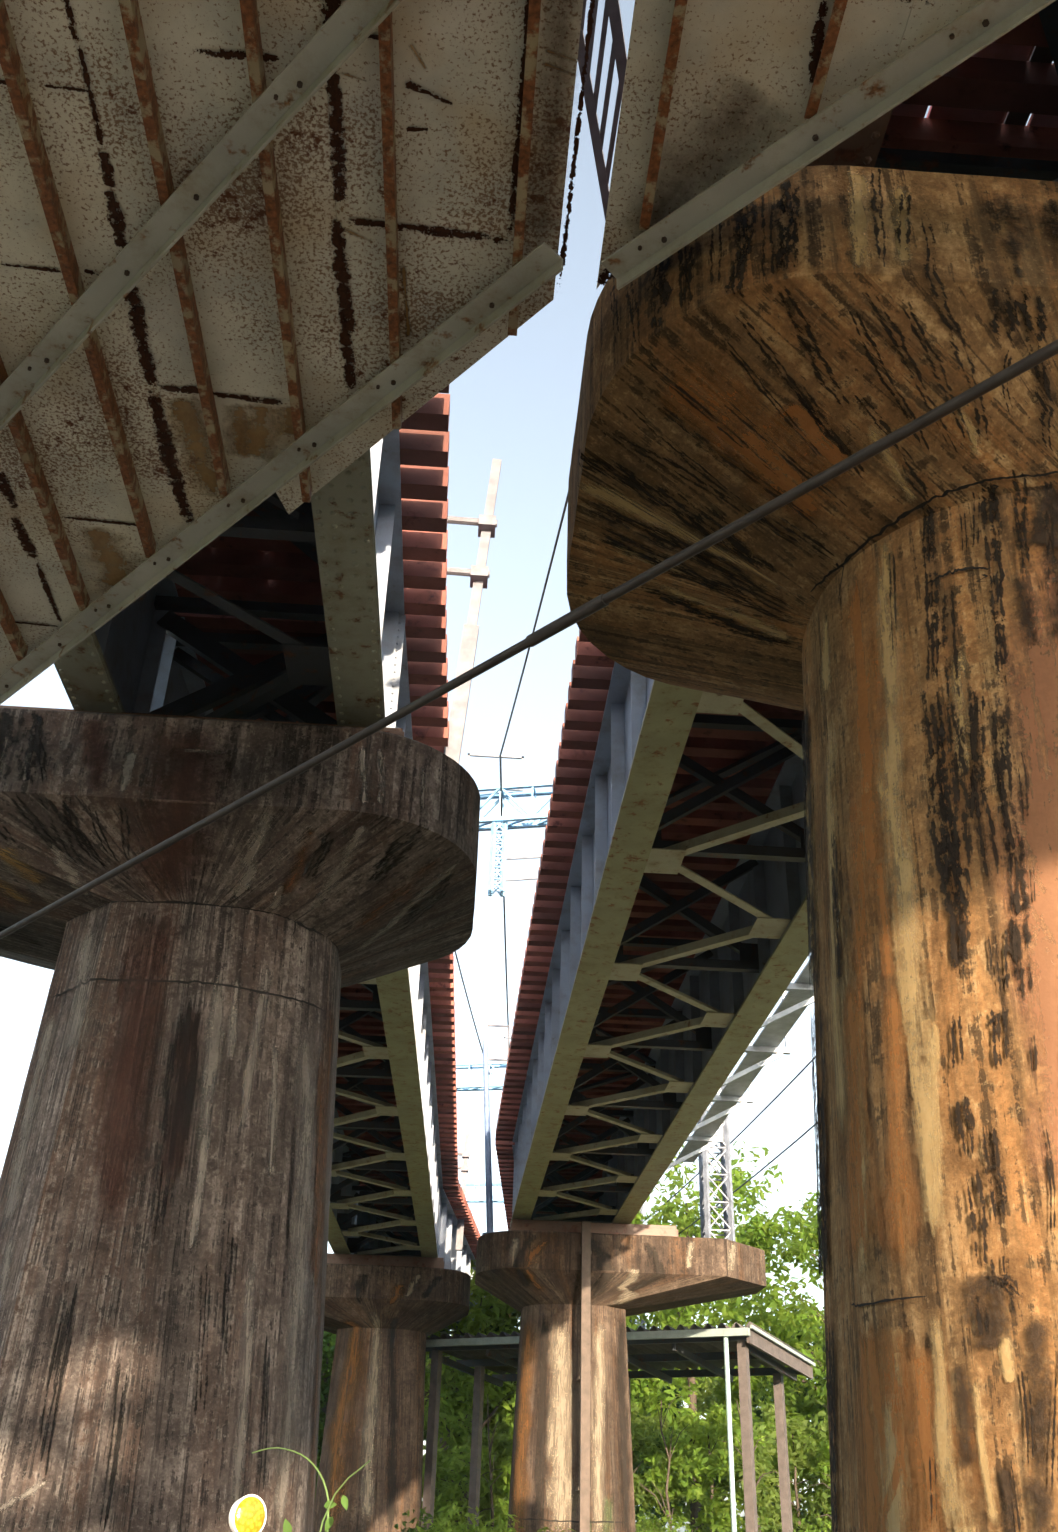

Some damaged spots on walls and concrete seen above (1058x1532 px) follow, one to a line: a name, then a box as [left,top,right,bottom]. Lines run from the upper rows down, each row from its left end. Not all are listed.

rust [44,0,128,249]
rust [326,0,529,390]
rust [544,0,595,285]
rust [808,0,828,84]
rust [124,286,294,523]
rust [0,472,62,627]
crack [811,471,1058,601]
leakage [578,169,1058,1532]
leakage [151,966,317,1523]
leakage [39,1276,78,1475]
leakage [100,1356,127,1530]
leakage [531,1240,666,1532]